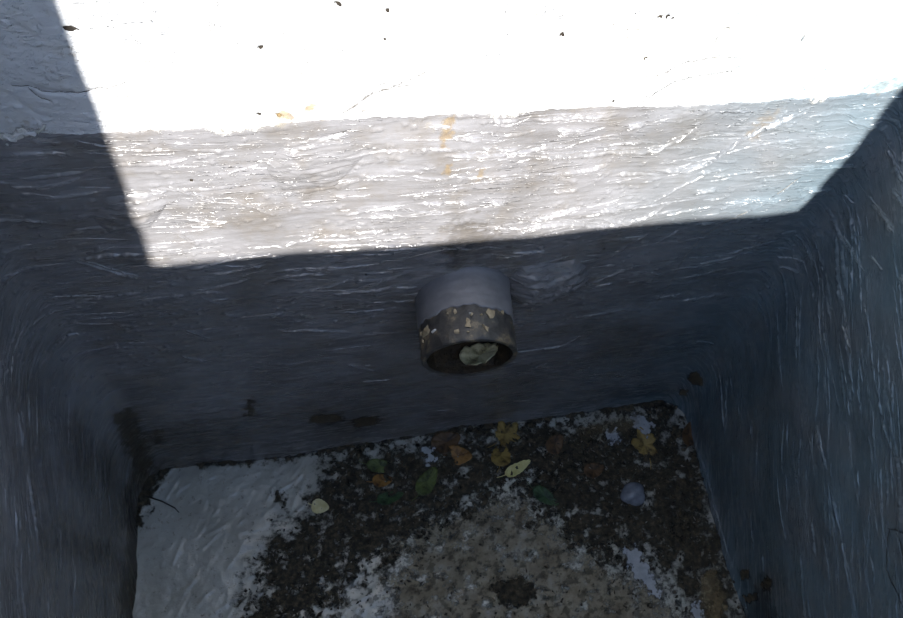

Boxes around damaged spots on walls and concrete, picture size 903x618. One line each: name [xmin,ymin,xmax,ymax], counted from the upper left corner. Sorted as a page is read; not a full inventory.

crack [12,74,143,101]